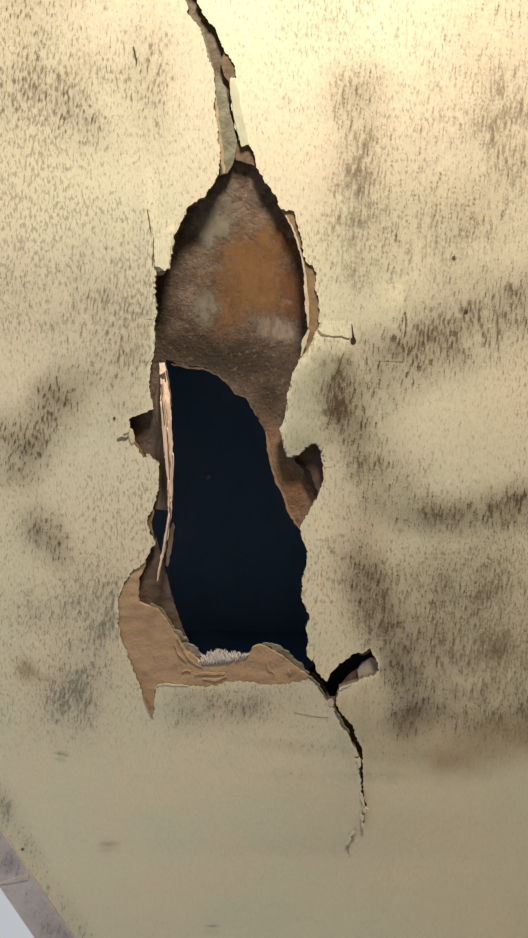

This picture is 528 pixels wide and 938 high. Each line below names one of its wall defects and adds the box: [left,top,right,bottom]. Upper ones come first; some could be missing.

mould [2,45,84,114]
crack [185,0,249,176]
mould [332,72,390,288]
mould [474,60,528,192]
corrosion [280,226,305,324]
mould [0,376,78,477]
peeling [118,141,325,718]
mould [314,273,528,532]
mould [22,507,68,560]
mould [45,580,119,729]
mould [340,543,528,737]
crack [295,671,366,857]